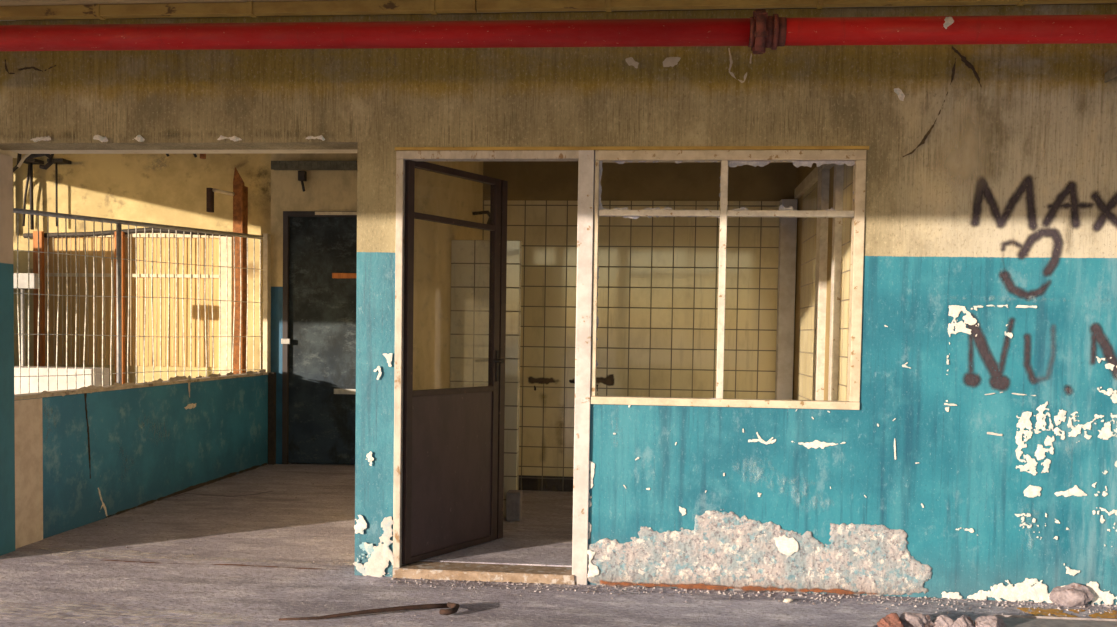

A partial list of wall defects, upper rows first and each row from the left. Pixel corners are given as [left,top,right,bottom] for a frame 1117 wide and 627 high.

crack [902,46,982,157]
peeling [946,305,1037,375]
peeling [743,429,776,445]
peeling [791,440,846,449]
peeling [985,387,1117,547]
peeling [353,515,394,577]
spalling [587,506,1117,619]